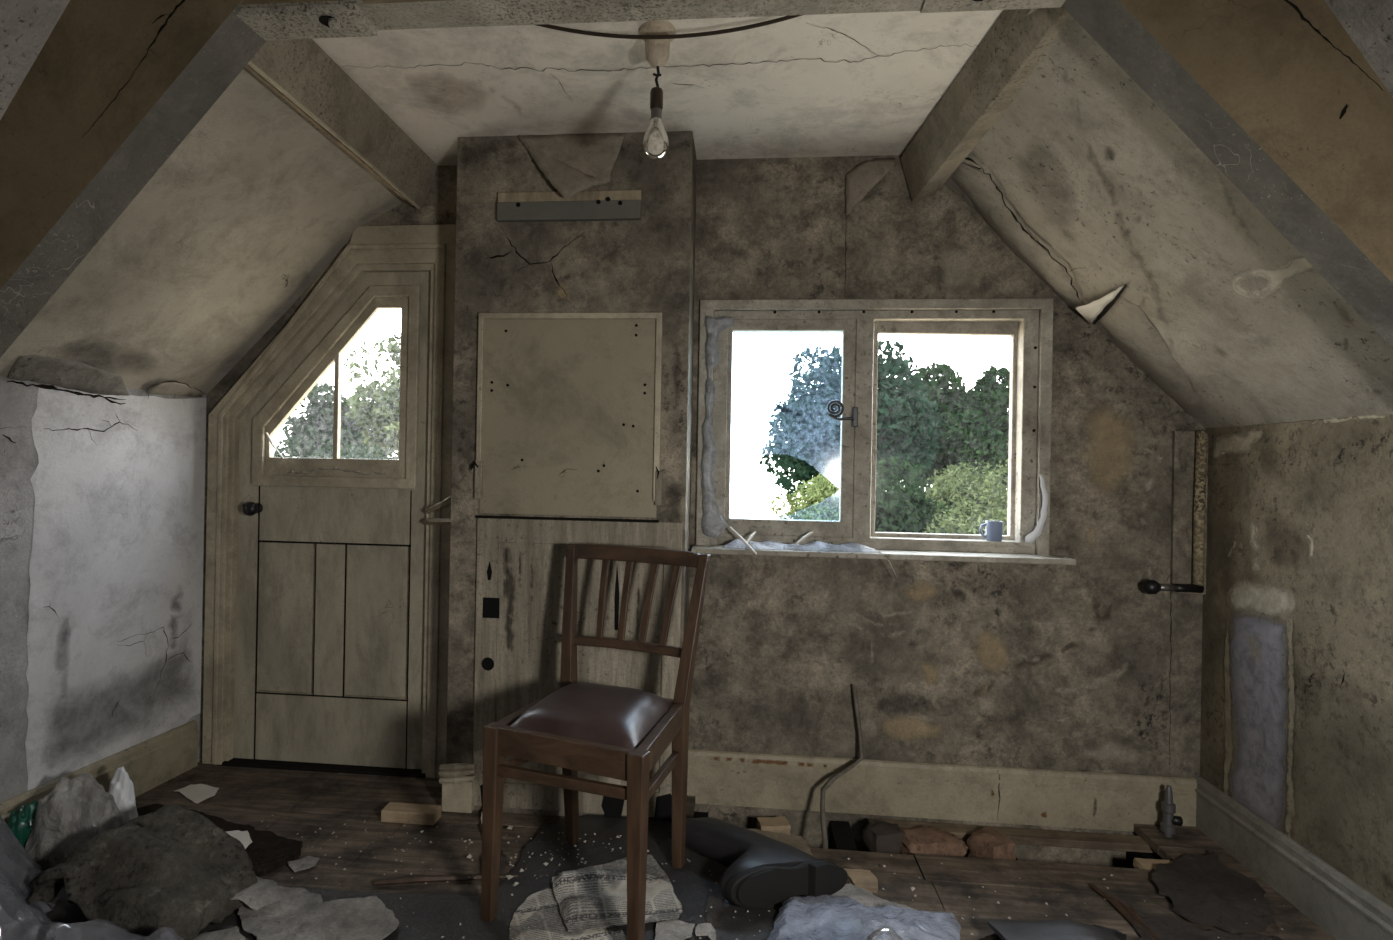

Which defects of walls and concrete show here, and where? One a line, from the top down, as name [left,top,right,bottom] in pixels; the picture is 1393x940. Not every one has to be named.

crack [338,24,978,102]
crack [962,157,1085,305]
crack [0,380,205,453]
peeling [1223,524,1295,838]